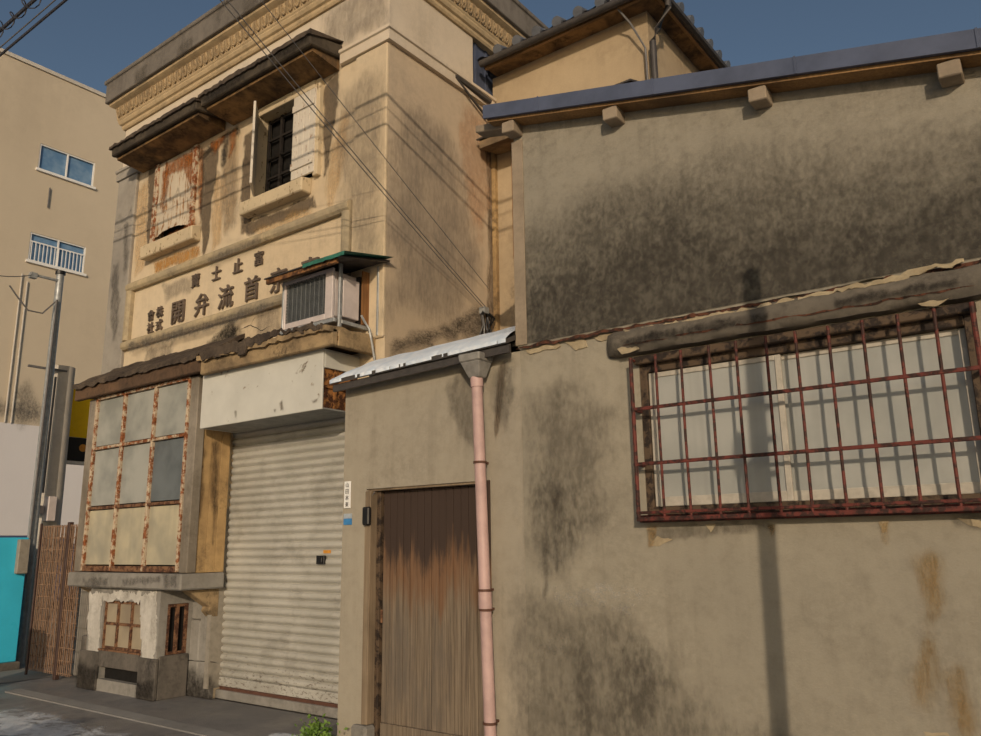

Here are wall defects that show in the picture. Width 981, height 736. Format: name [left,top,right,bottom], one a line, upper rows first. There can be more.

corrosion [162,130,236,230]
water stain [485,151,493,317]
water stain [527,173,981,341]
water stain [625,315,767,346]
flaking render [958,518,981,528]
peeling [87,590,157,659]